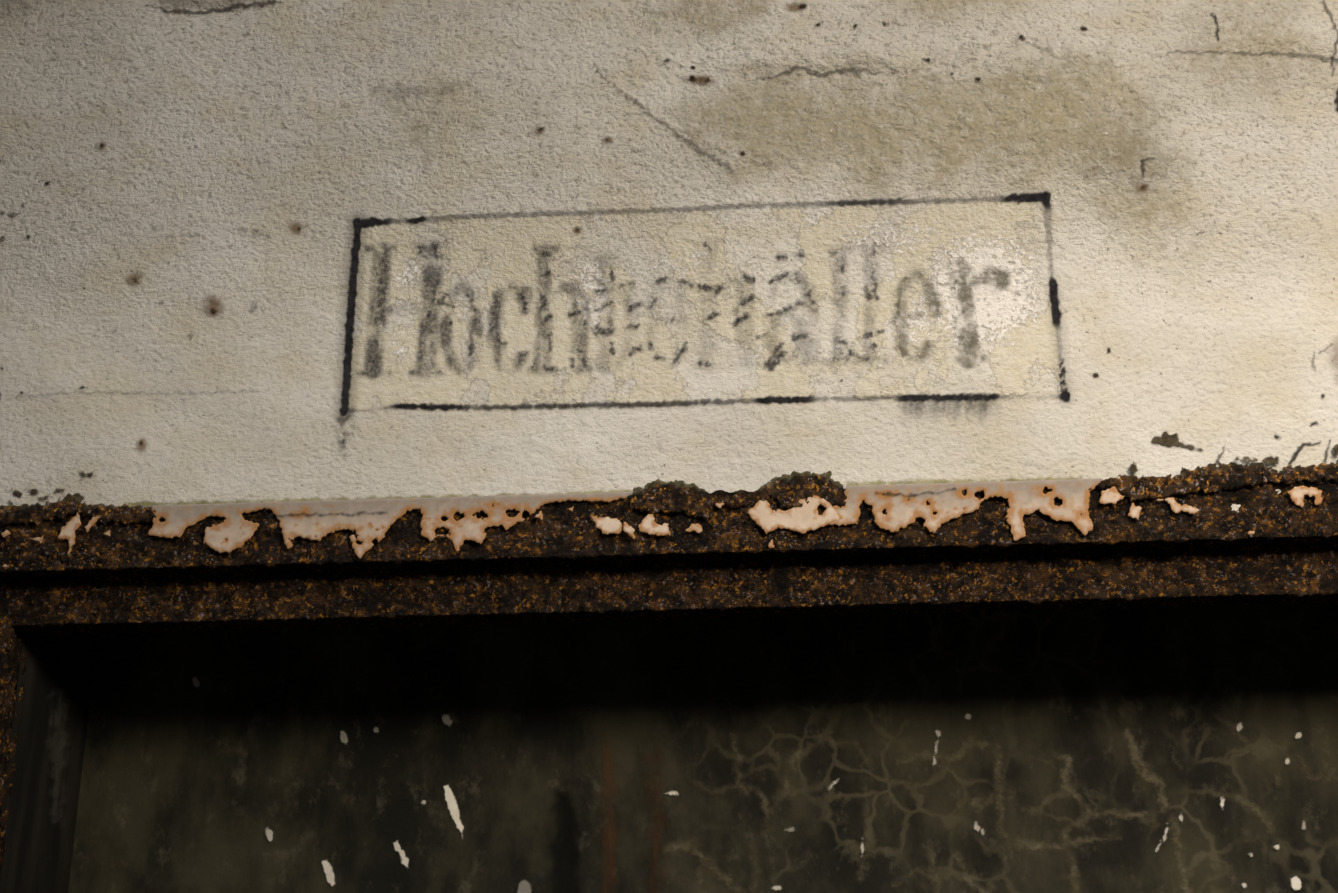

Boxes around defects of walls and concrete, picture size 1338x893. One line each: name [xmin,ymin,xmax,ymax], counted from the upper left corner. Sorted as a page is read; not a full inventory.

crack [1325,5,1338,111]
damp [702,70,1151,176]
peeling [8,488,110,555]
rust [0,493,156,527]
peeling [148,491,702,558]
rust [629,471,847,520]
peeling [748,478,1142,548]
peeling [1157,497,1200,514]
rust [1085,460,1338,501]
peeling [1288,485,1323,507]